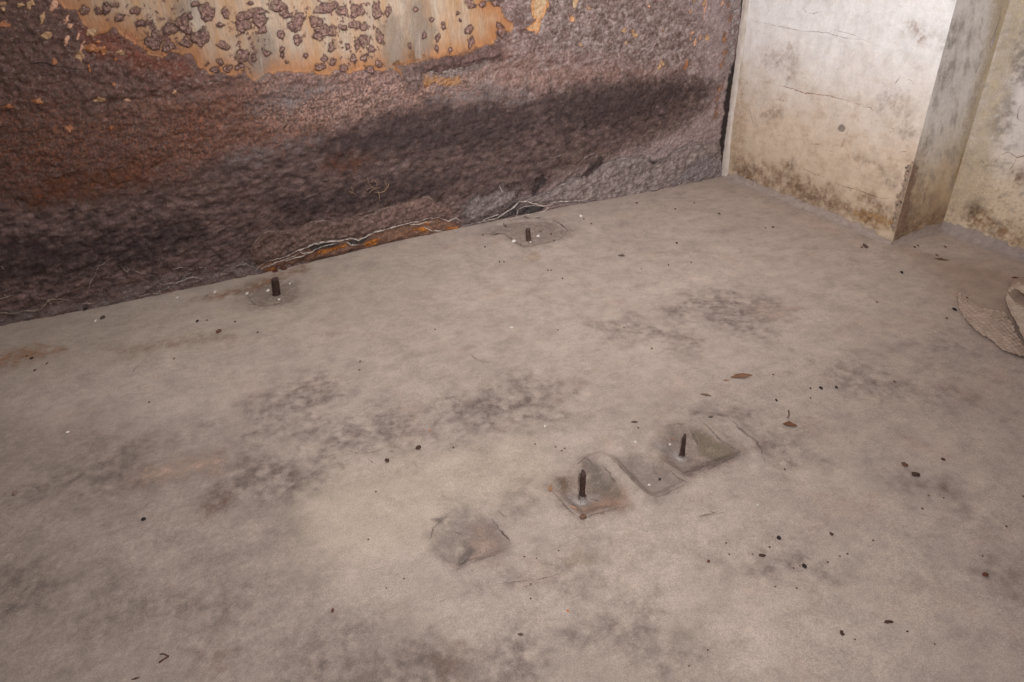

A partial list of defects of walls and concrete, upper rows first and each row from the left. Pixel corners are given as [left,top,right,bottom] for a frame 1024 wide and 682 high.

peeling [0,0,148,73]
crack [0,186,588,314]
rust [218,196,460,297]
leakage [0,75,715,325]
leakage [733,158,893,225]